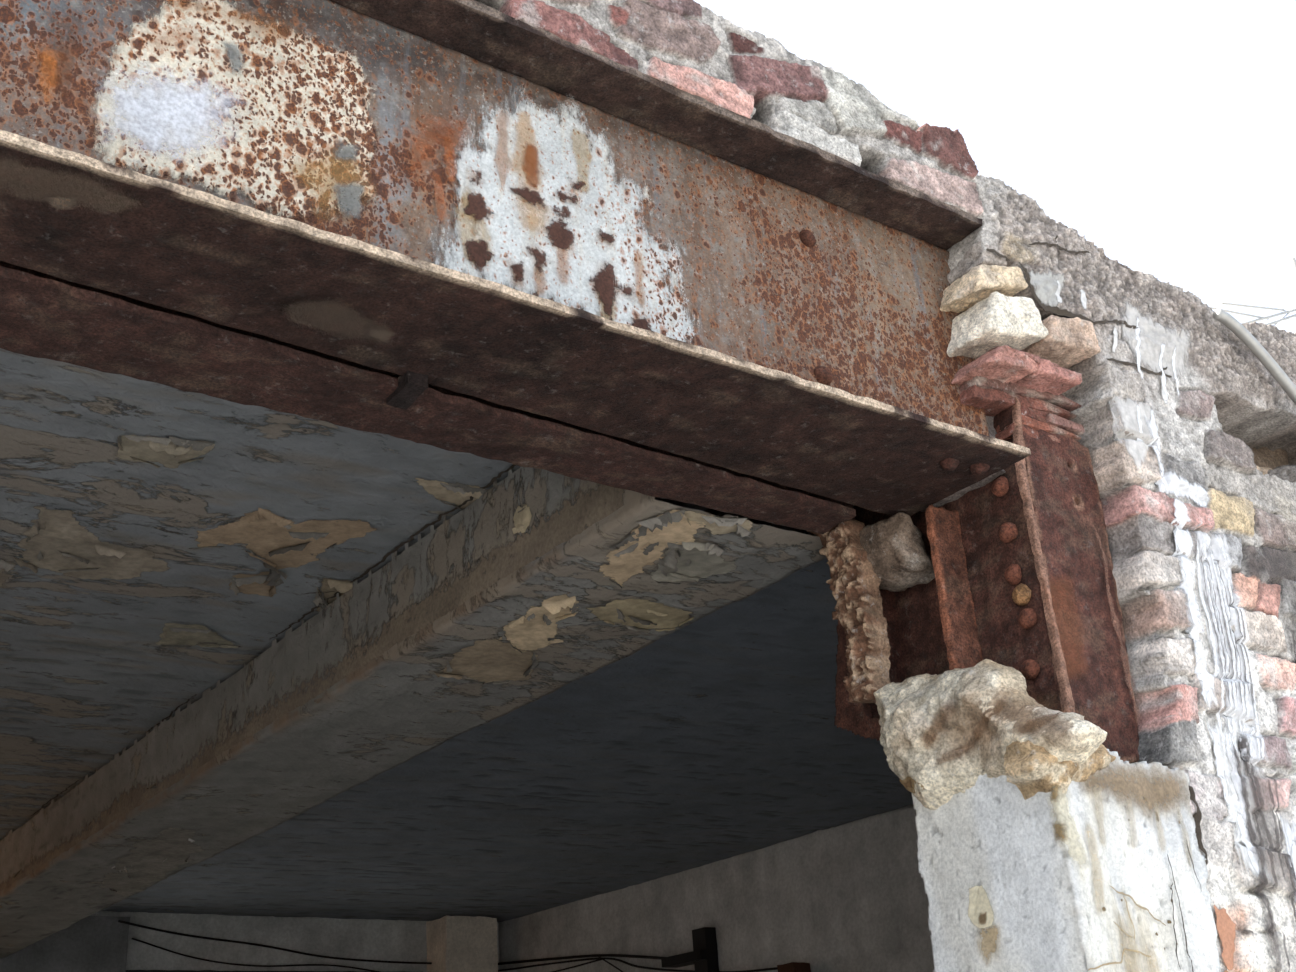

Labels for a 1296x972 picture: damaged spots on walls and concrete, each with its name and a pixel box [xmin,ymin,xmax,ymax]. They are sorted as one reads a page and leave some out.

peeling [95,0,378,223]
peeling [435,93,700,343]
efflorescence [1029,271,1064,307]
peeling [116,435,215,468]
peeling [189,507,377,597]
peeling [415,478,489,510]
peeling [512,504,532,534]
peeling [431,509,753,685]
leakage [1107,302,1296,972]
spalling [899,776,924,794]
spalling [1004,740,1116,863]
crack [1088,786,1208,972]